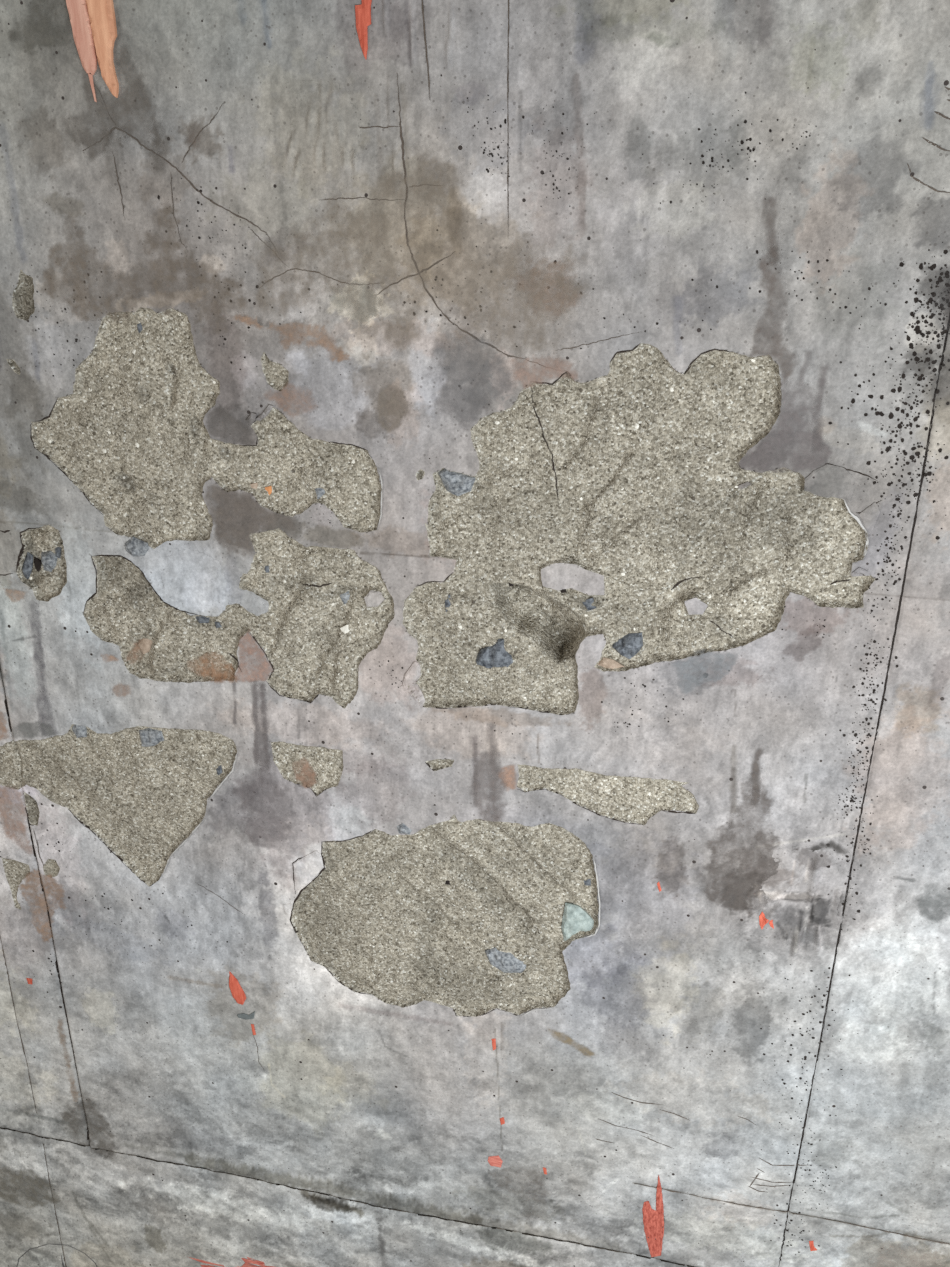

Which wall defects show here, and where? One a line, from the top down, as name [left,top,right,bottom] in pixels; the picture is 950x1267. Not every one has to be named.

leakage [79,77,151,158]
crack [83,0,639,370]
leakage [331,274,387,321]
spalling [30,308,880,715]
spalling [16,525,67,602]
spalling [0,724,237,887]
spalling [271,741,344,796]
spalling [517,764,699,825]
leakage [744,750,770,812]
leakage [707,831,778,909]
spalling [283,815,600,1017]